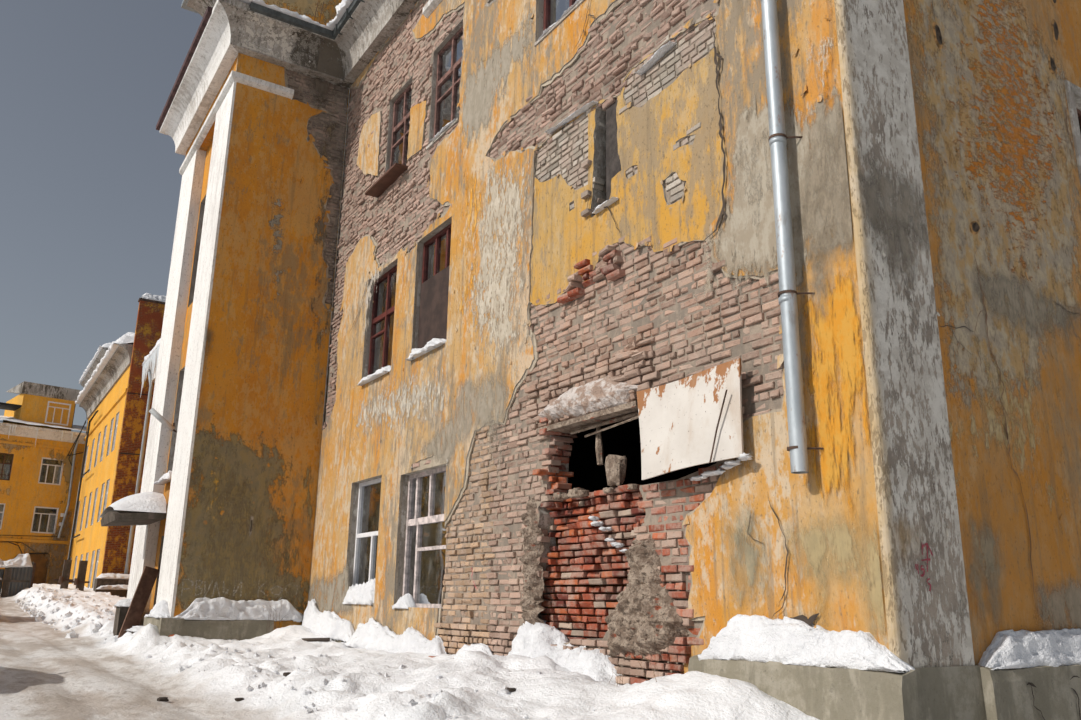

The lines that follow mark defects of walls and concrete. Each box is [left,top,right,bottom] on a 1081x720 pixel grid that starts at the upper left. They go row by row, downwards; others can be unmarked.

spalling [240,0,464,429]
crack [703,13,726,242]
leakage [704,96,778,308]
leakage [784,87,853,293]
leakage [863,164,929,276]
leakage [175,424,352,625]
peeling [352,360,455,443]
spalling [434,0,784,685]
leakage [792,523,885,629]
crack [940,247,1039,618]
crack [1027,682,1045,720]